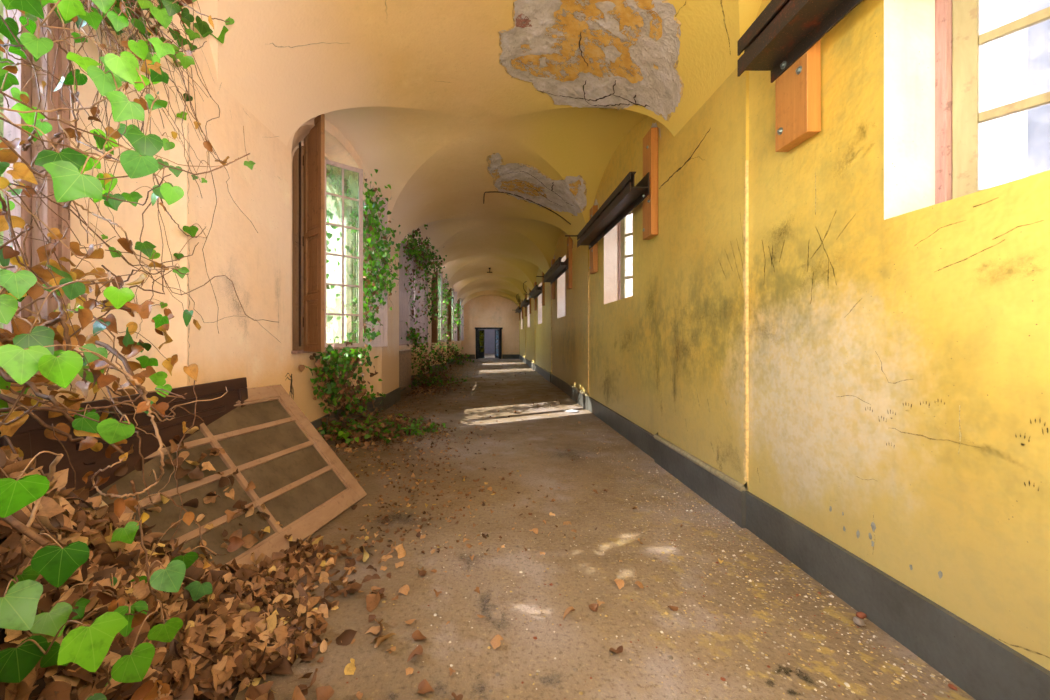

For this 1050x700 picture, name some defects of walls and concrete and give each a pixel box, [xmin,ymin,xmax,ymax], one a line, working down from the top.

peeling [498,0,684,138]
peeling [486,153,599,216]
crack [659,129,710,189]